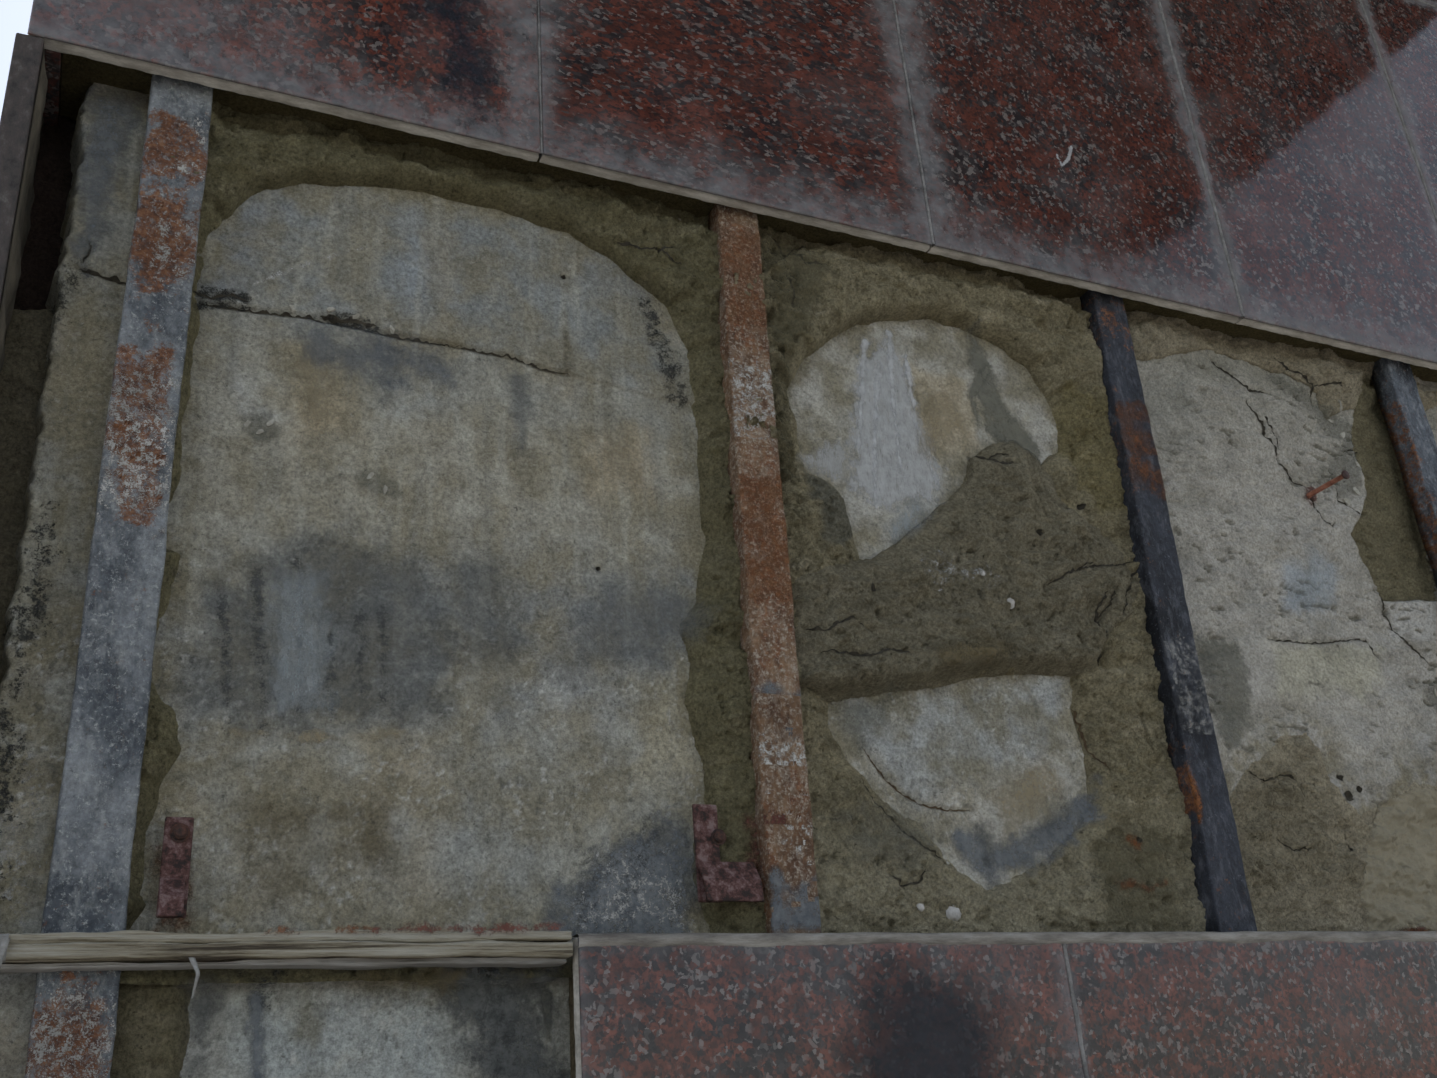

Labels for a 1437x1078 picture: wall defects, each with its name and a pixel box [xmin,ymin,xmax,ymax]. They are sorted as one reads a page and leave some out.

spalling [326,307,395,334]
crack [194,291,569,375]
crack [1213,358,1362,526]